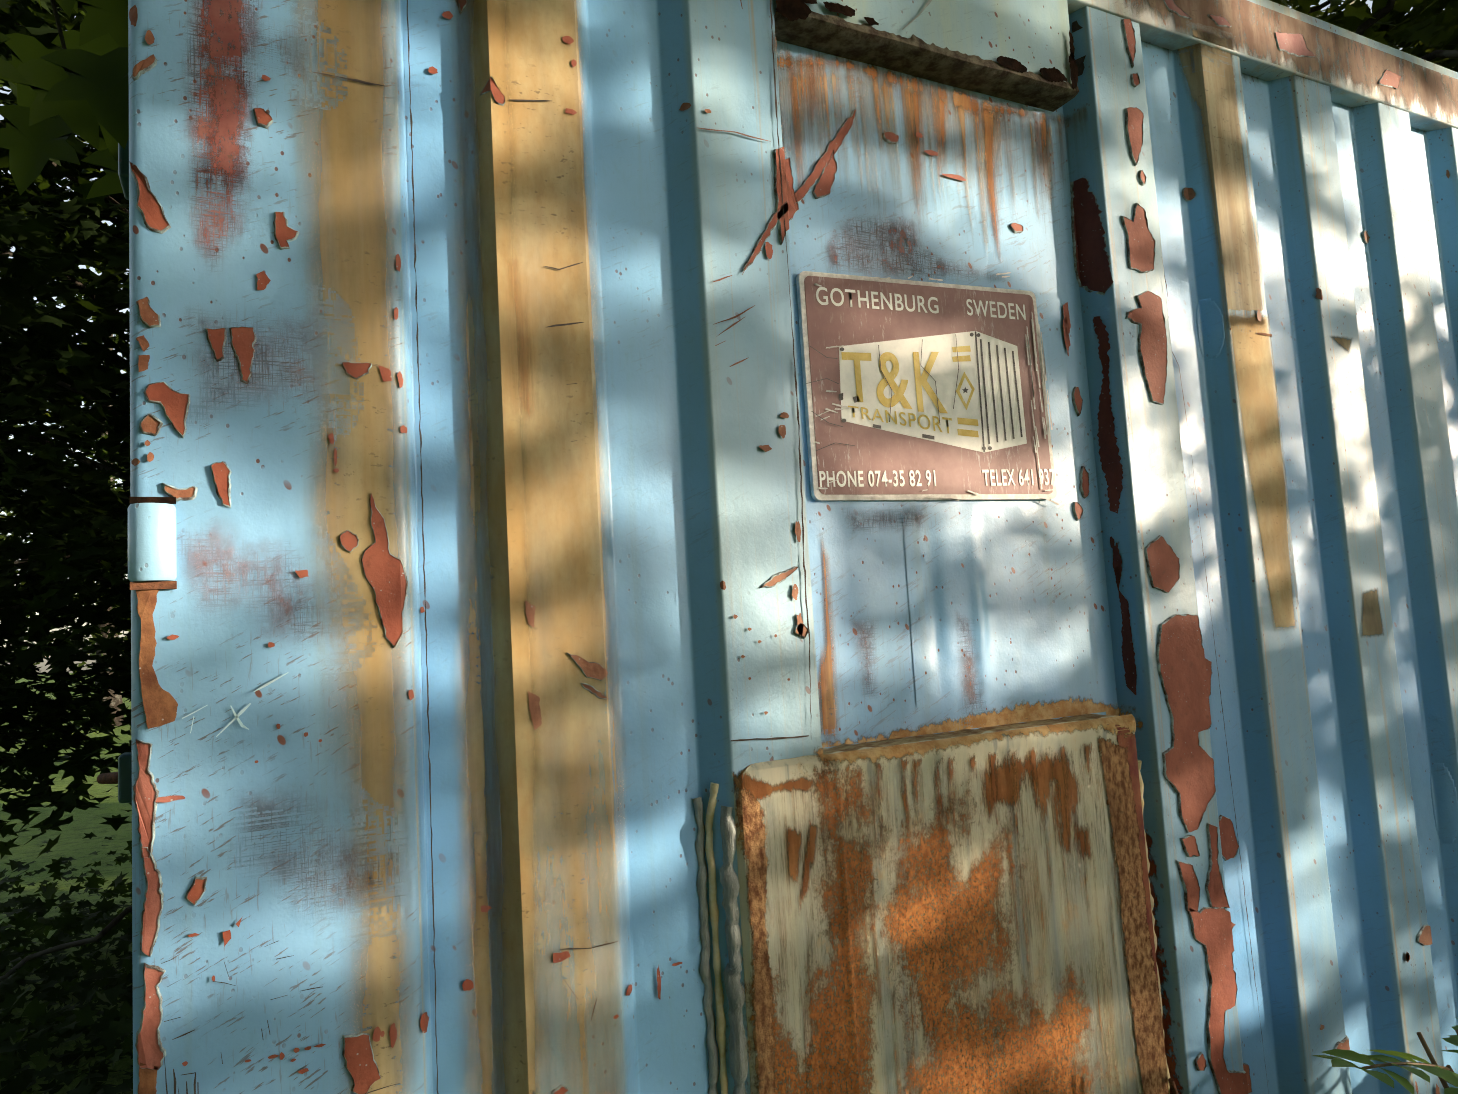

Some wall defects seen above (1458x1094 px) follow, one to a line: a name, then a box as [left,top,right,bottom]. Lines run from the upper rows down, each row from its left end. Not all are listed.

peeling [129,161,171,234]
peeling [742,110,856,272]
corrosion [775,34,1062,247]
peeling [1070,107,1156,295]
corrosion [1125,0,1458,123]
peeling [1072,316,1123,521]
peeling [1125,291,1168,405]
peeling [339,494,425,648]
peeling [1145,535,1180,593]
peeling [132,739,185,1070]
corrosion [732,549,1183,1094]
peeling [1156,614,1252,1094]